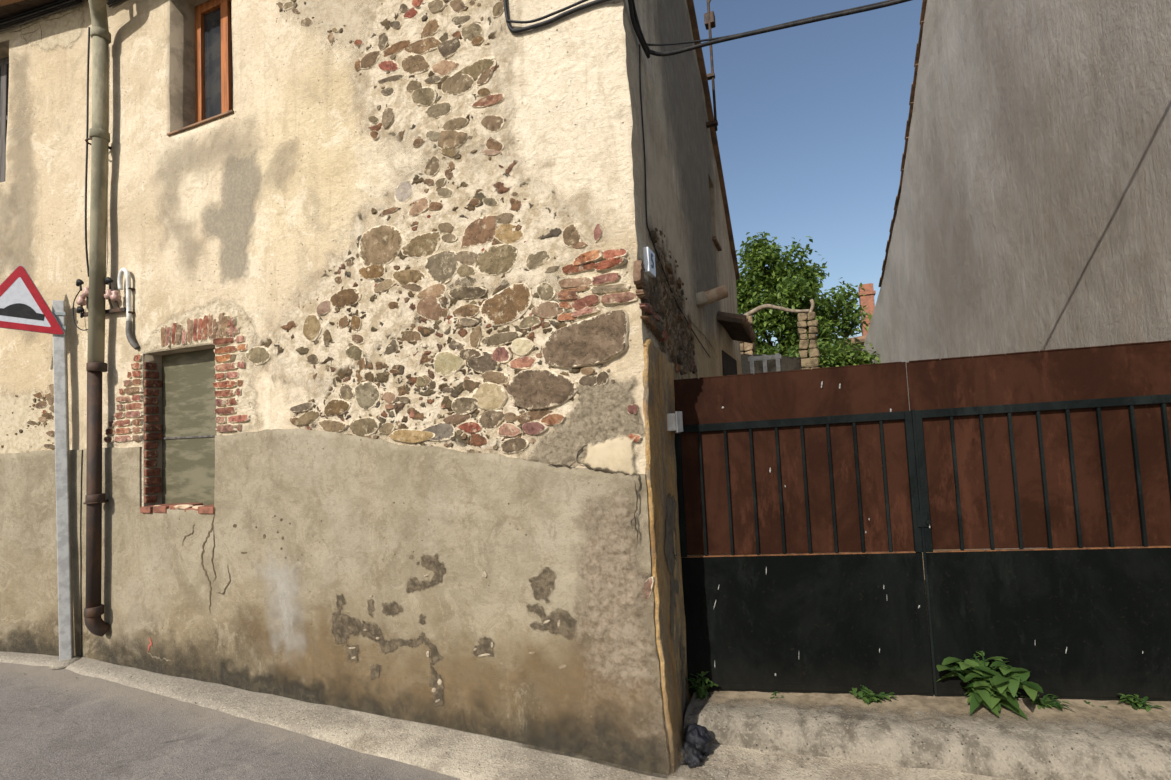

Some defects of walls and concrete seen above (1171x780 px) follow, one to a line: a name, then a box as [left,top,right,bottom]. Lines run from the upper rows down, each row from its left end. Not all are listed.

flaking render [102,0,697,456]
crack [182,510,230,610]
peeling [332,594,444,707]
peeling [406,554,446,593]
peeling [527,567,577,640]